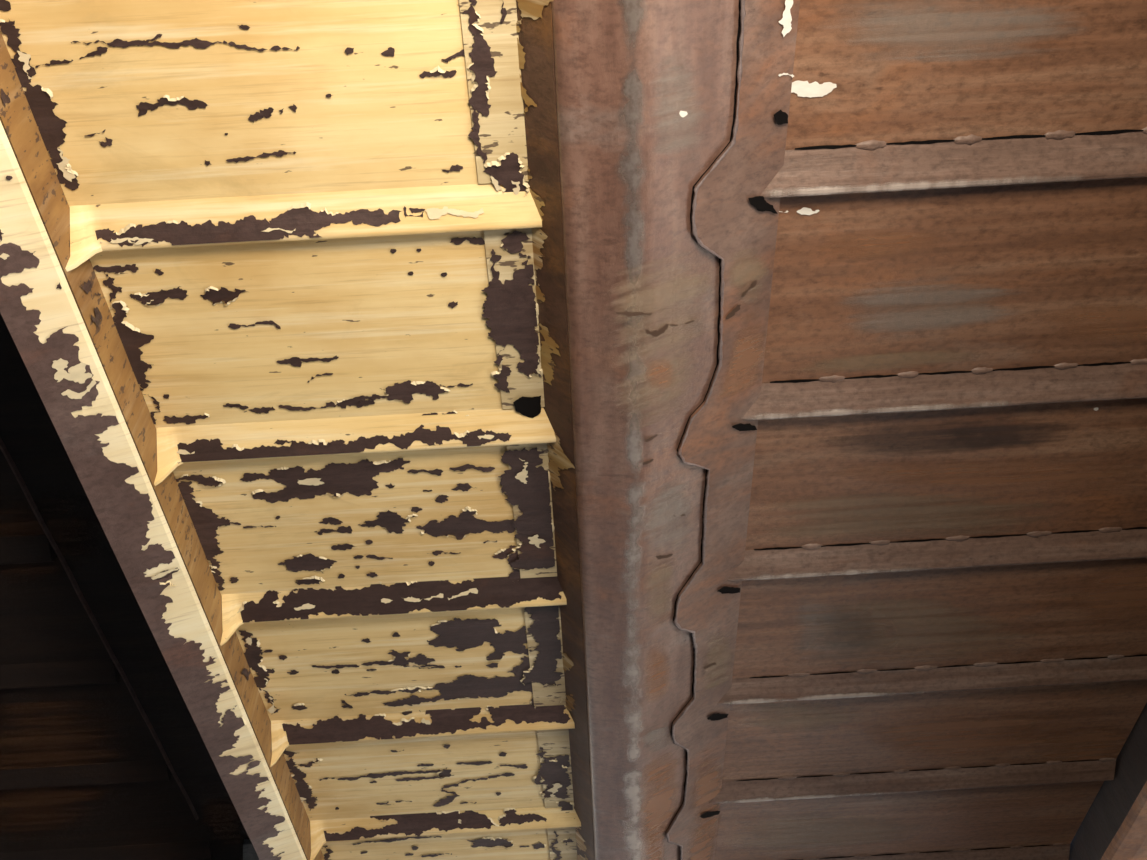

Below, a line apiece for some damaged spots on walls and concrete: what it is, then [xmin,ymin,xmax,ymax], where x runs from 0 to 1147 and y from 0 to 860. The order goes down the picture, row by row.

peeling [779,0,793,37]
peeling [419,0,497,117]
peeling [136,95,207,117]
peeling [248,104,297,123]
peeling [779,73,837,98]
peeling [483,152,530,197]
peeling [95,202,401,247]
peeling [450,237,485,245]
peeling [481,230,543,393]
peeling [0,229,285,860]
peeling [176,380,574,811]
peeling [323,808,547,860]